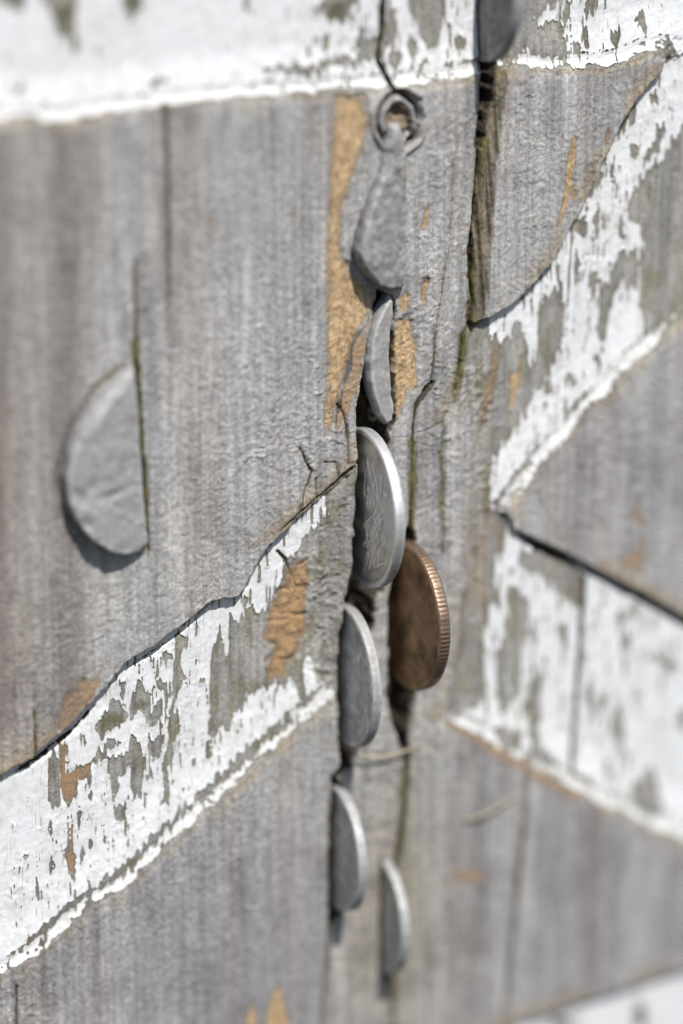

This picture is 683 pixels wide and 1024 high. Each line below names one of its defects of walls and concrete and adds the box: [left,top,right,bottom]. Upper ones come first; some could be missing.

peeling [0,0,480,431]
crack [277,61,494,566]
peeling [445,0,683,840]
crack [132,601,213,664]
crack [344,571,390,630]
crack [14,710,90,773]
peeling [0,496,336,974]
crack [330,734,358,786]
crack [386,665,413,872]
crack [321,898,341,1024]
crack [381,971,396,1024]